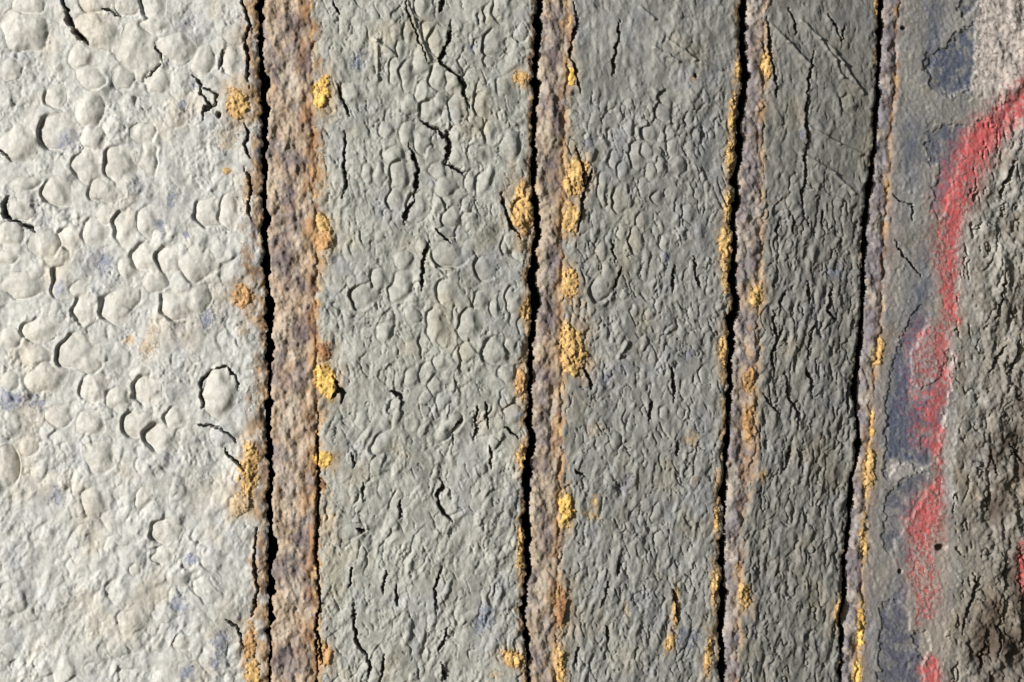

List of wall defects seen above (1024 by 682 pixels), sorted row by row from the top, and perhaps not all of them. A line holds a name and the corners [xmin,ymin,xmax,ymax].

crack [60,0,89,46]
crack [402,119,466,225]
corrosion [510,177,536,243]
corrosion [561,159,590,233]
corrosion [718,191,732,294]
crack [192,0,279,682]
corrosion [313,342,339,424]
crack [451,0,543,682]
corrosion [555,321,589,377]
crack [717,0,825,682]
crack [763,0,914,682]
corrosion [312,451,341,555]